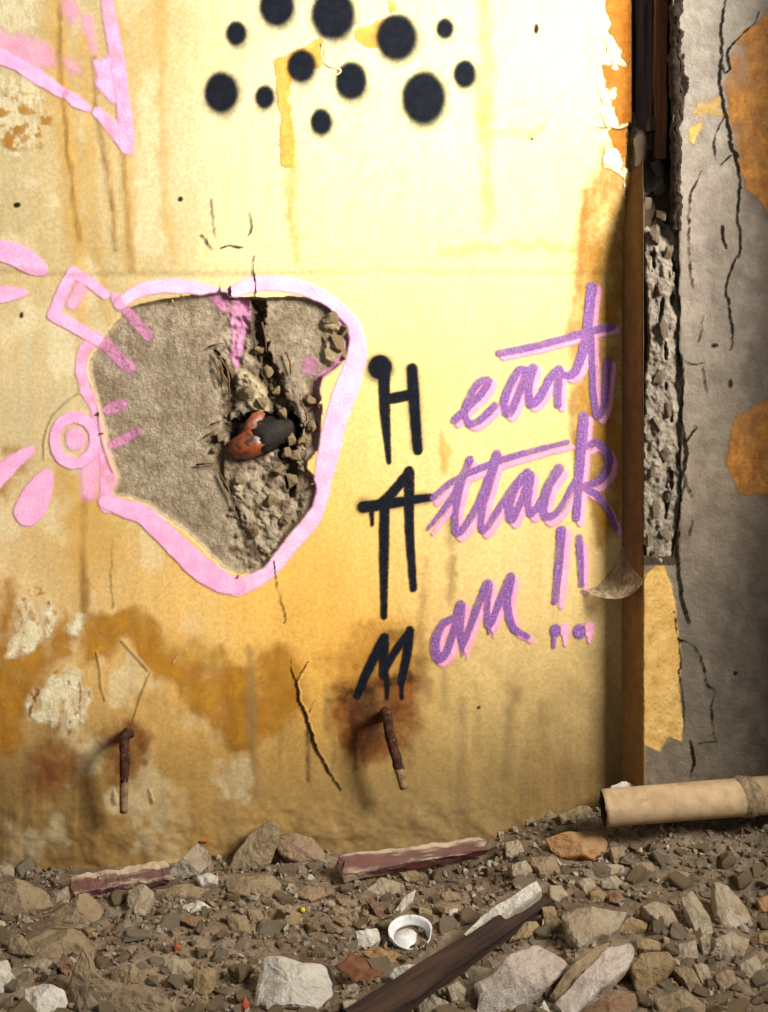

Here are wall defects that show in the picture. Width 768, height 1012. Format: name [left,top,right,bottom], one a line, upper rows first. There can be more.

spalling [88,291,349,575]
spalling [600,0,768,751]
crack [674,0,760,777]
damp [1,582,17,633]
peeling [6,589,58,658]
peeling [26,669,91,733]
peeling [68,613,85,636]
damp [0,609,299,753]
crack [291,660,342,791]
rust [329,661,422,763]